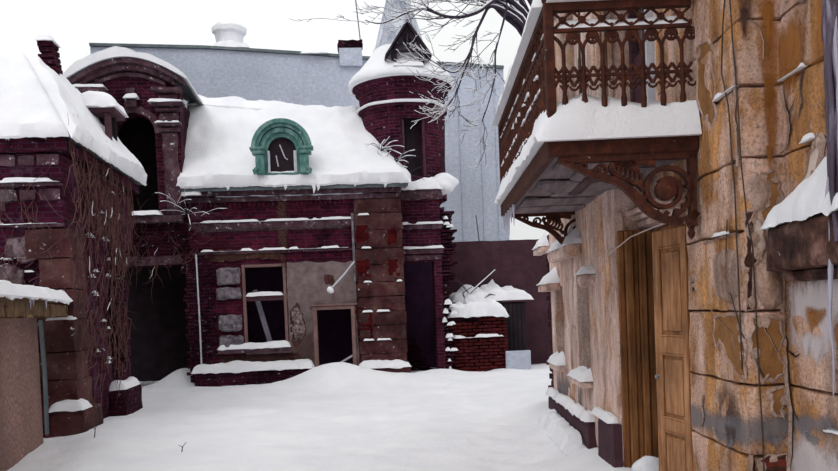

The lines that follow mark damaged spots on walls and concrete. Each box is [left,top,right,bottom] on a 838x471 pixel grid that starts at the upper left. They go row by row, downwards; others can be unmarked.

leakage [741,0,750,37]
flaking render [713,168,787,419]
flaking render [290,302,306,346]
crack [758,301,800,471]
crack [698,395,706,426]